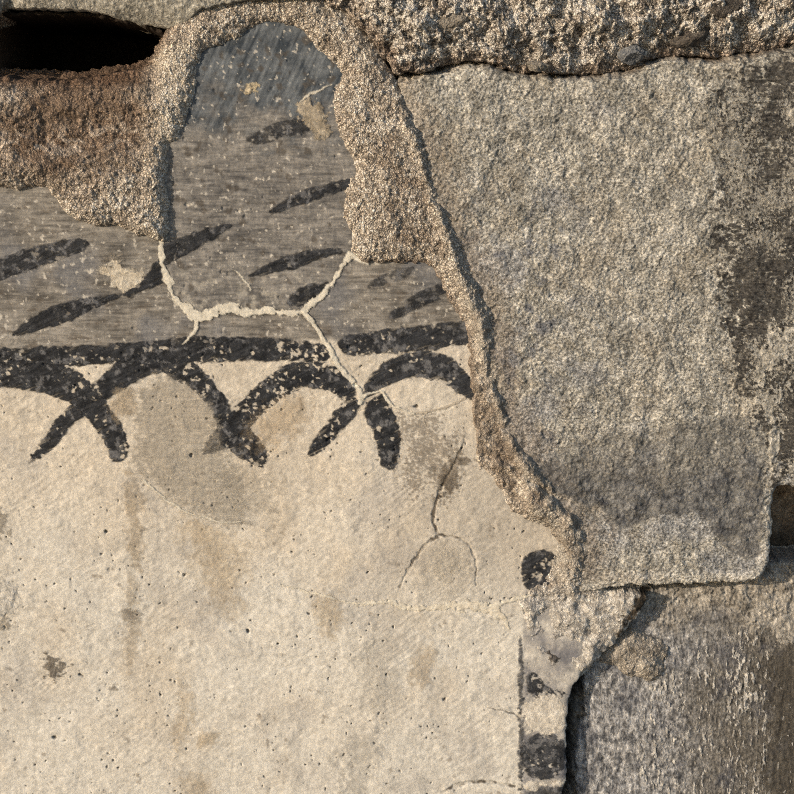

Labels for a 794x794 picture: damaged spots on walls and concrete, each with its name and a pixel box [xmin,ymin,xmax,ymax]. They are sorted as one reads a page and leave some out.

spalling [0,11,165,73]
spalling [296,97,333,140]
crack [300,84,332,102]
crack [158,241,466,427]
crack [411,479,458,565]